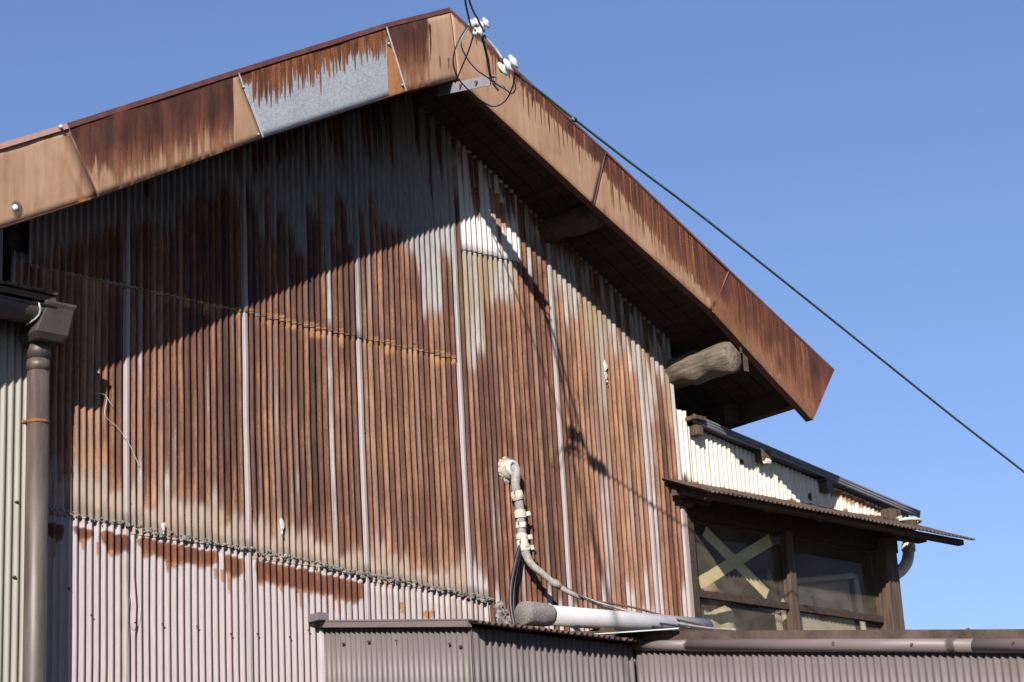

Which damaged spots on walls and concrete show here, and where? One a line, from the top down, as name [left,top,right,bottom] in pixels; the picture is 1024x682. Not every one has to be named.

corrosion [70,18,449,198]
corrosion [16,103,698,622]
corrosion [452,13,834,419]